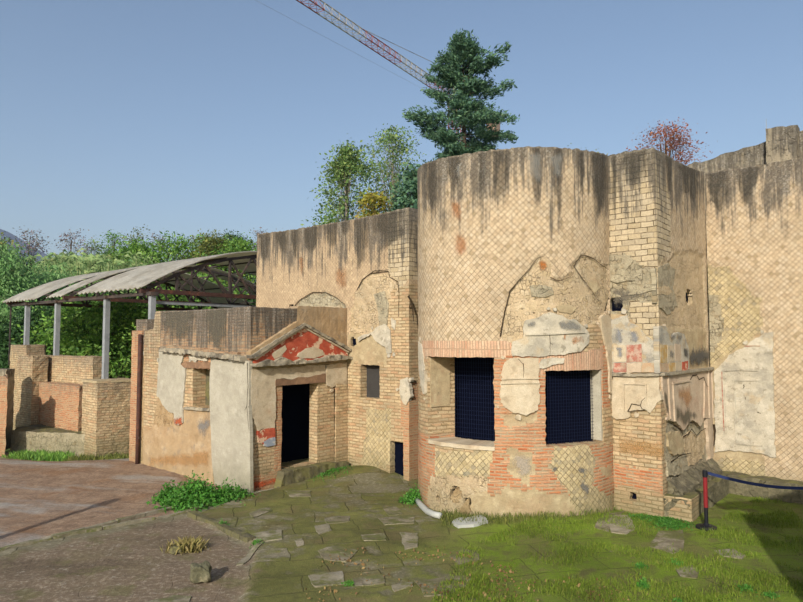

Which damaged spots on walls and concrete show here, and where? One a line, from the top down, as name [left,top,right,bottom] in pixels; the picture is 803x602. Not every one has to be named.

peeling [156,352,211,426]
peeling [396,337,430,405]
peeling [497,254,776,477]